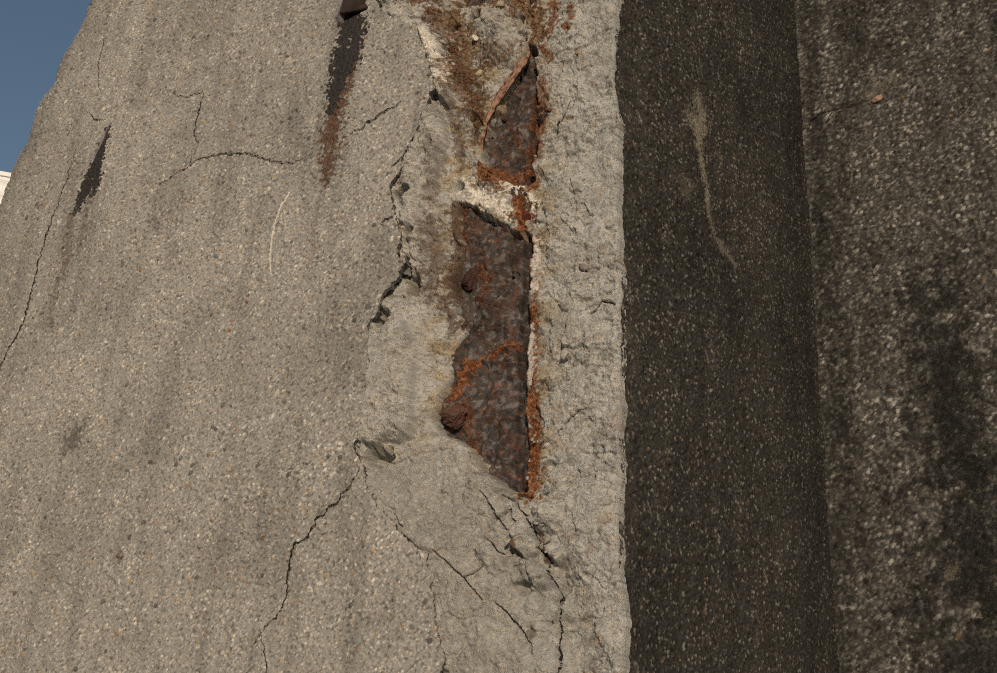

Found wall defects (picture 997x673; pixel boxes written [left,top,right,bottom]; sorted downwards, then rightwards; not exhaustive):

crack [170,91,310,177]
rust [313,10,371,189]
crack [0,151,75,365]
rust [392,0,574,504]
spalling [355,0,632,673]
crack [246,470,359,673]
crack [434,491,565,673]